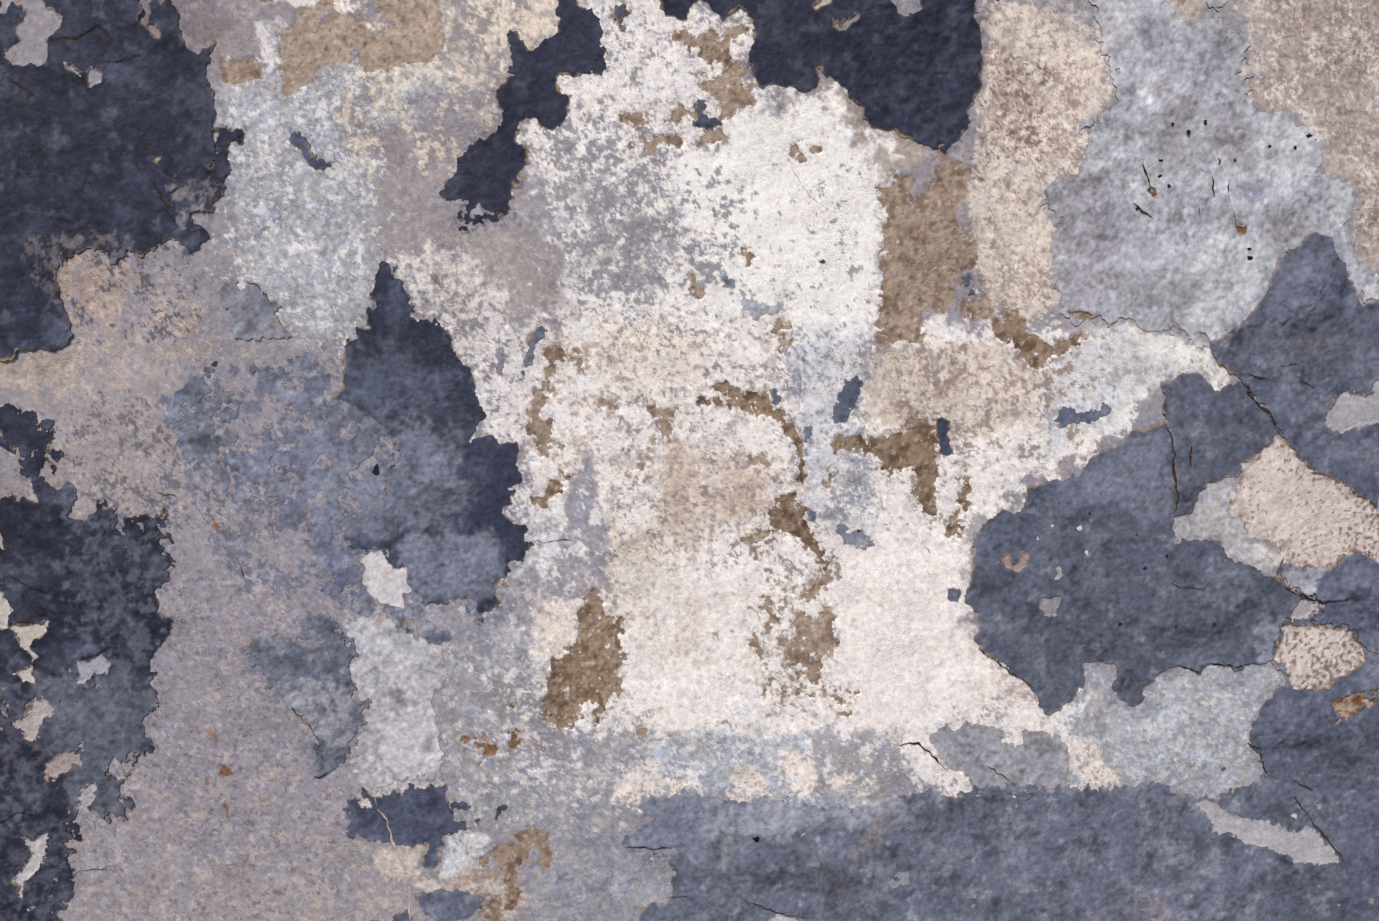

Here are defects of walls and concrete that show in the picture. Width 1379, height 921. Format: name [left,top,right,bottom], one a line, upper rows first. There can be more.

peeling [0,0,262,361]
peeling [289,131,331,170]
peeling [438,0,631,230]
peeling [0,403,175,921]
peeling [160,261,584,869]
spalling [540,587,628,734]
spalling [598,396,675,471]
peeling [618,0,1379,921]
spalling [370,826,641,921]
crack [1248,742,1345,861]